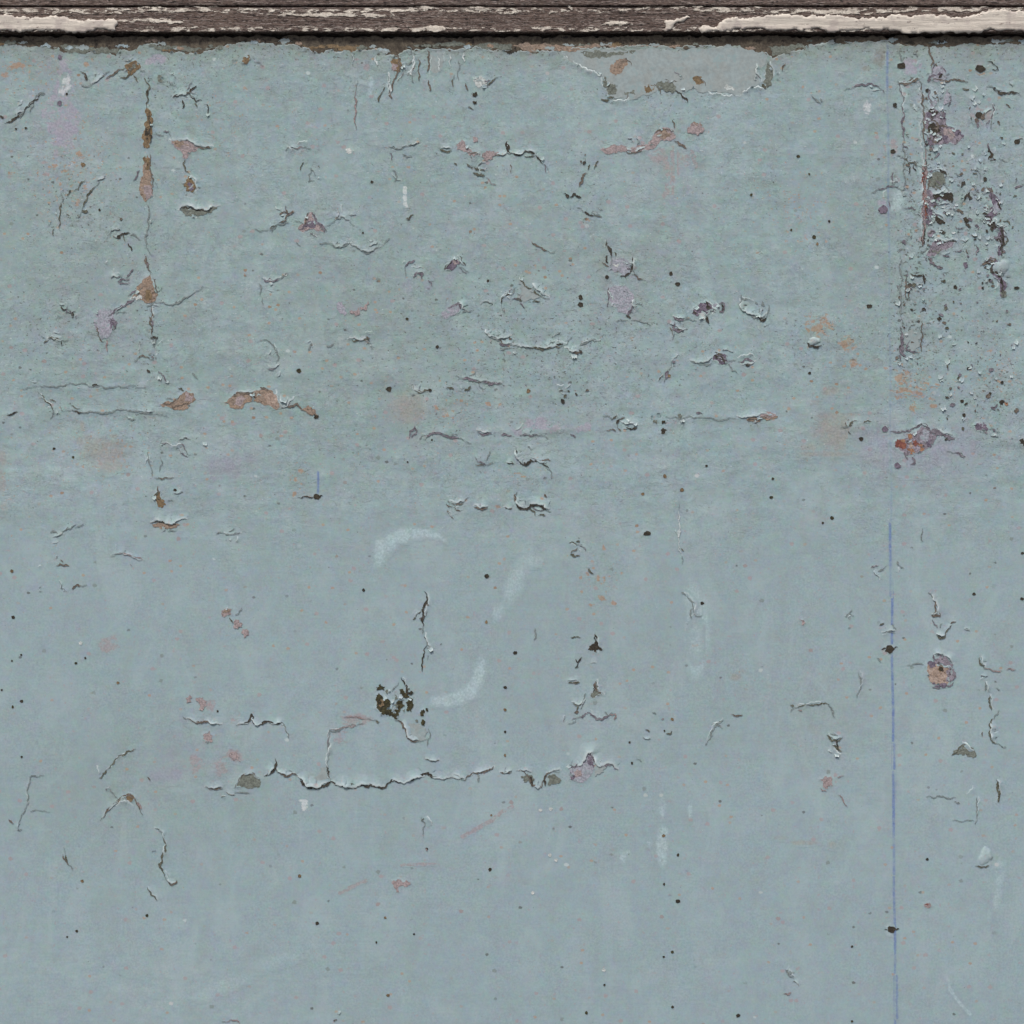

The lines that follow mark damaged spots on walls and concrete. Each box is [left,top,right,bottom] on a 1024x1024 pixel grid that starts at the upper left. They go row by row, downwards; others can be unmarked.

peeling [0,34,1024,301]
peeling [688,297,725,323]
crack [9,286,207,479]
peeling [222,383,319,419]
peeling [890,418,956,465]
crack [411,589,442,670]
peeling [585,632,606,656]
spalling [907,647,958,689]
peeling [373,674,431,745]
peeling [228,752,268,794]
peeling [564,741,622,787]
crack [147,824,177,900]